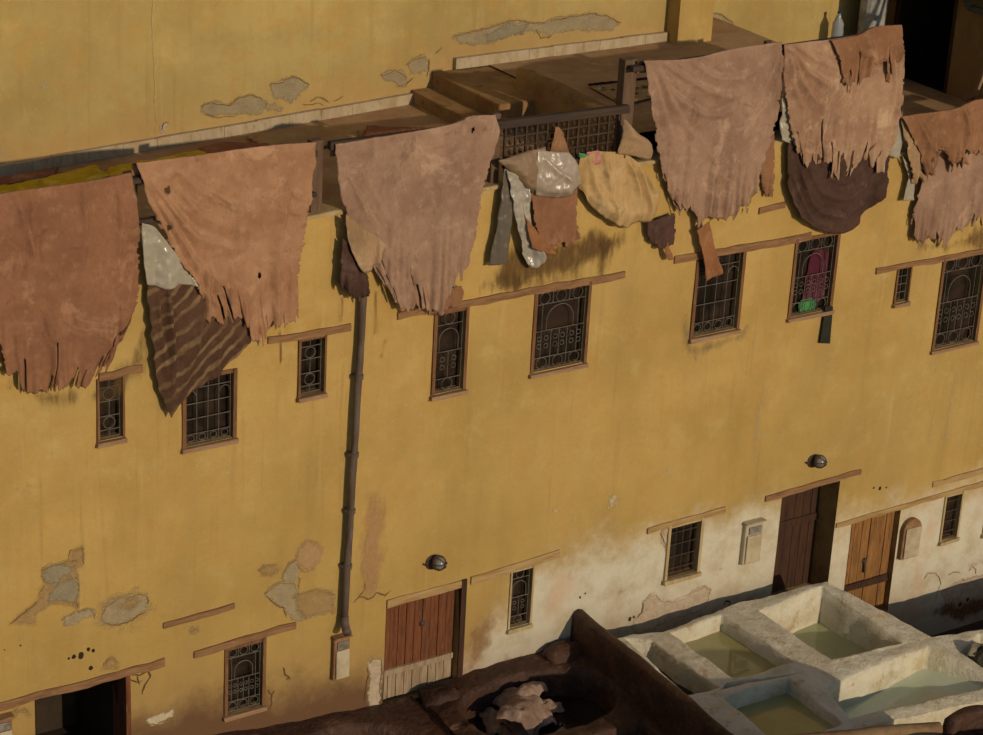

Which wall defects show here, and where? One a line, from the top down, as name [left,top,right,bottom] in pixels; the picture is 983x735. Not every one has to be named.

spalling [453,12,622,46]
spalling [381,48,442,87]
spalling [202,75,344,118]
peeling [12,546,149,626]
peeling [259,541,336,621]
spalling [629,585,711,634]